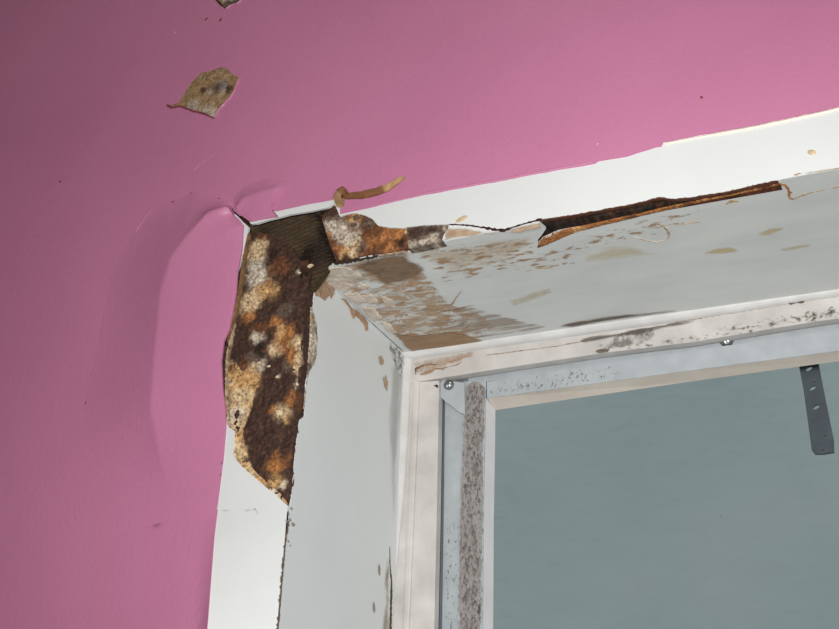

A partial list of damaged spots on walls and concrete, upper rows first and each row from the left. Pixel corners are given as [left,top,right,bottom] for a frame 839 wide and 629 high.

spalling [166,67,240,119]
spalling [296,307,318,409]
flaking render [314,267,396,332]
spalling [407,225,449,253]
water stain [347,256,539,373]
rust [420,242,581,282]
water stain [564,315,635,326]
water stain [582,322,687,353]
spalling [225,360,289,505]
mould [445,382,492,629]
crack [276,507,295,629]
crack [387,548,395,629]